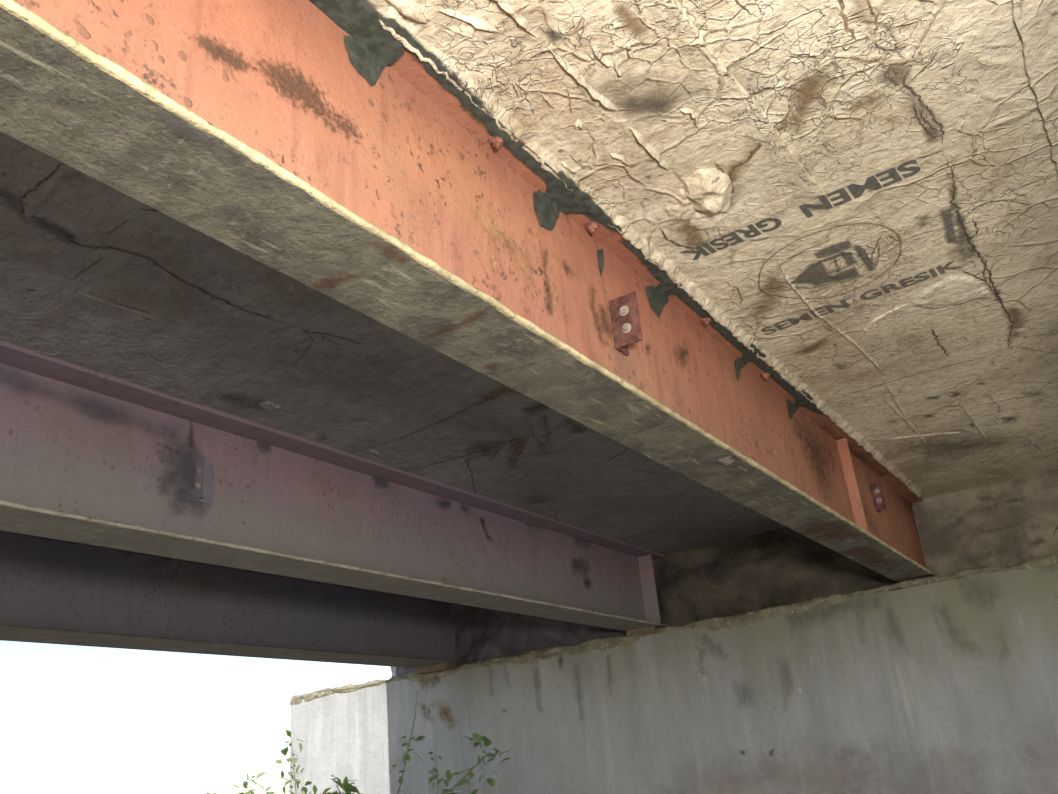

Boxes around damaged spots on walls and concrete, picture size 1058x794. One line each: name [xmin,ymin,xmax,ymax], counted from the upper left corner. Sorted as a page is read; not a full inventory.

crack [711,0,756,17]
rust [198,37,359,142]
crack [0,163,372,366]
crack [659,98,795,251]
crack [724,281,773,342]
crack [829,0,1058,402]